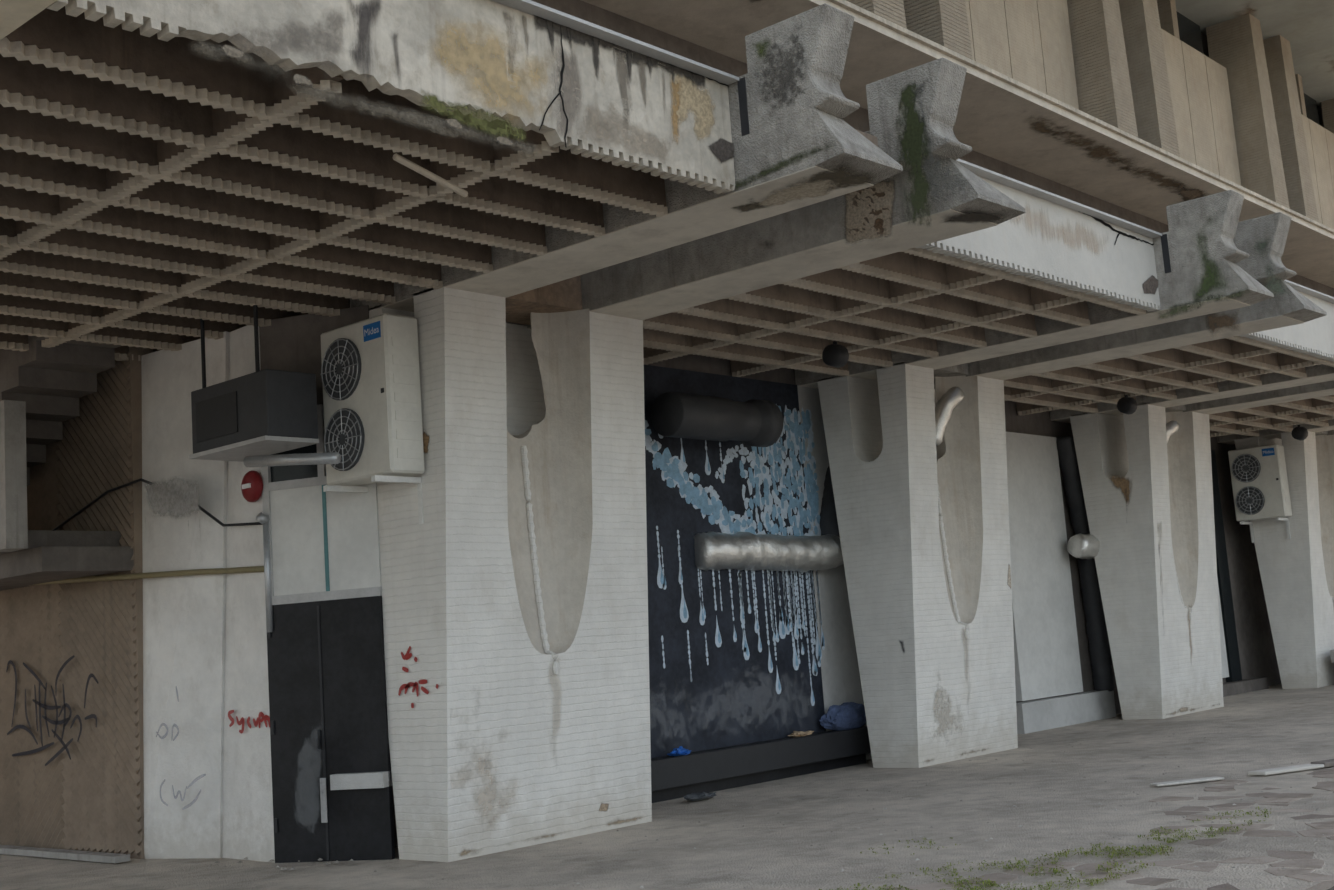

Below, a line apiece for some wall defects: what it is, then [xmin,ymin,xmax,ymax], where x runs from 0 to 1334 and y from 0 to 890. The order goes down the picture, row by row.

water stain [352,0,380,73]
water stain [439,31,539,106]
crack [535,15,568,148]
water stain [504,13,705,130]
water stain [762,36,804,108]
spalling [758,180,895,243]